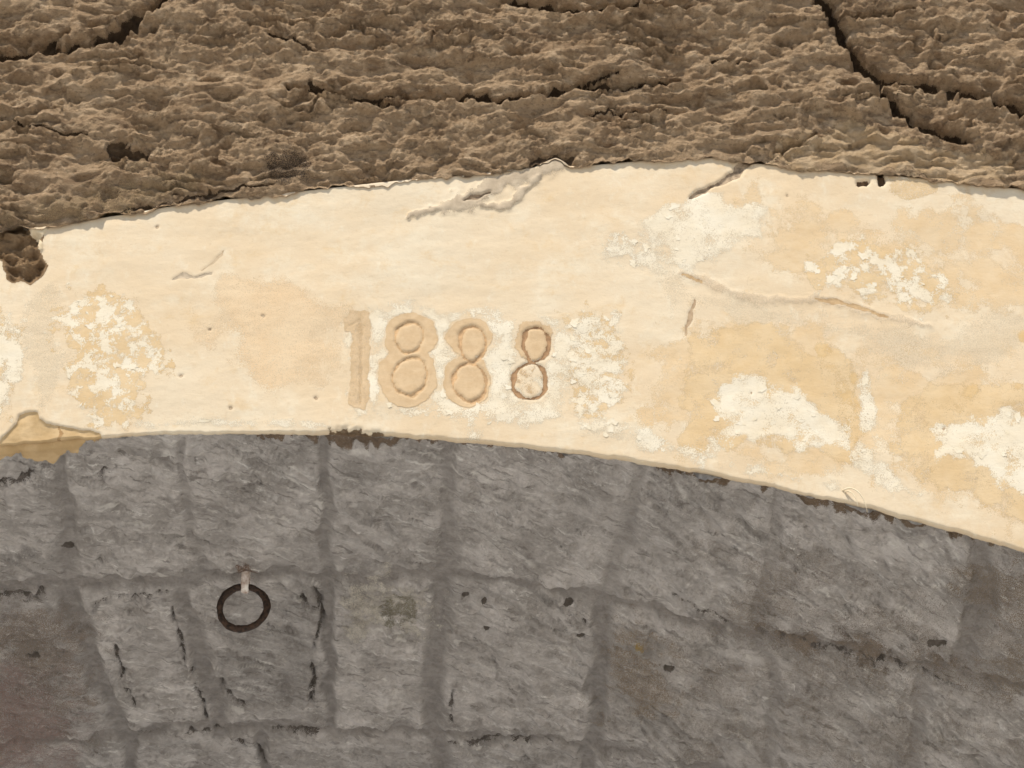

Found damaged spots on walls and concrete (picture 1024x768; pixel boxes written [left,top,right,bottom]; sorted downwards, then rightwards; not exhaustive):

crack [814,0,1024,145]
peeling [600,188,768,276]
crack [681,273,703,336]
crack [815,298,889,318]
peeling [801,234,960,323]
peeling [0,282,183,464]
peeling [329,296,1024,522]